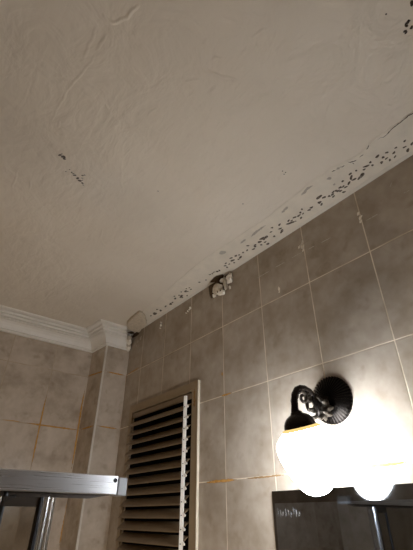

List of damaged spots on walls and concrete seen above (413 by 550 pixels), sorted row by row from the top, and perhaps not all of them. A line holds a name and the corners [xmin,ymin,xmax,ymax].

flaking render [126,111,413,352]